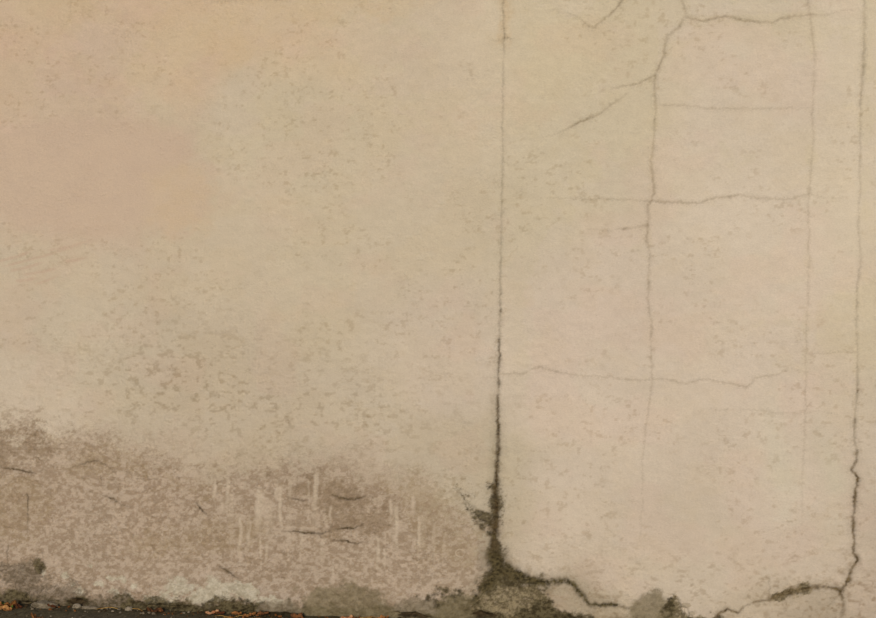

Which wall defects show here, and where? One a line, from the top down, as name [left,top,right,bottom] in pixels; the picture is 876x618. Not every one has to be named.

crack [453,0,870,618]
damp [0,404,483,614]
flaking render [487,592,531,618]